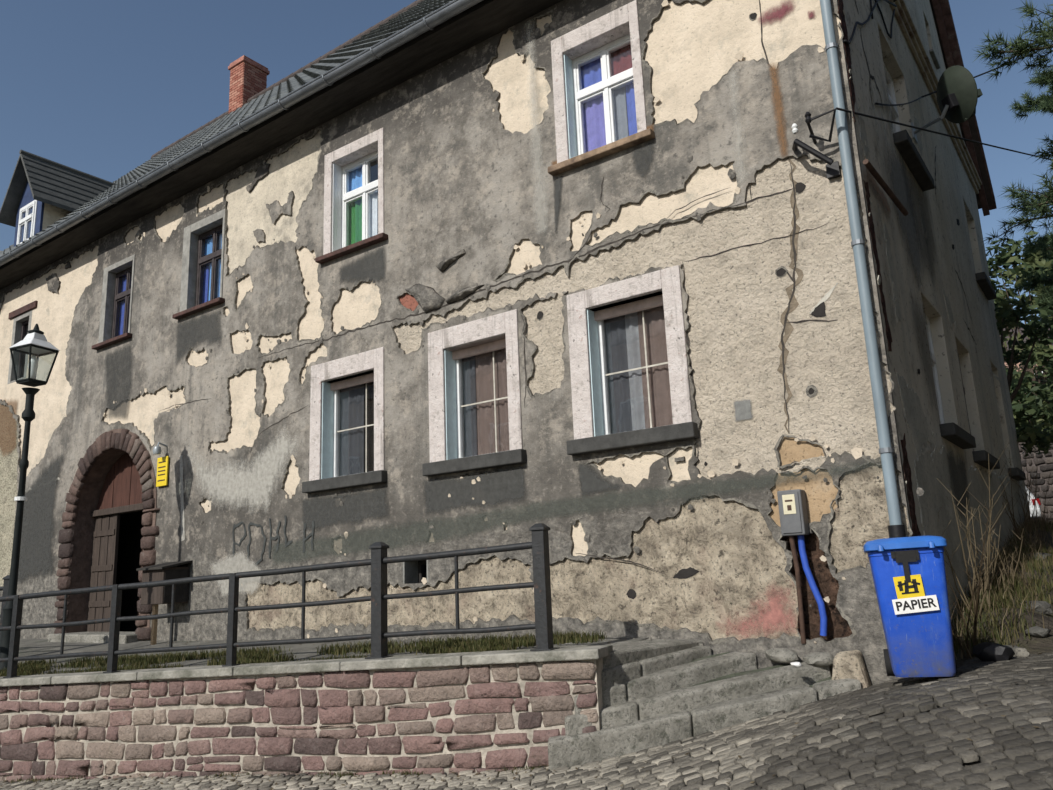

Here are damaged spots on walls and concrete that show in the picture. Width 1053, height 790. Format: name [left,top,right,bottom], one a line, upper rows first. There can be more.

peeling [480,28,551,134]
peeling [641,0,870,159]
peeling [122,128,382,455]
crack [259,157,836,434]
peeling [0,245,99,592]
peeling [101,384,186,451]
peeling [200,496,213,524]
peeling [281,455,301,499]
peeling [387,153,925,644]
peeling [241,578,371,638]